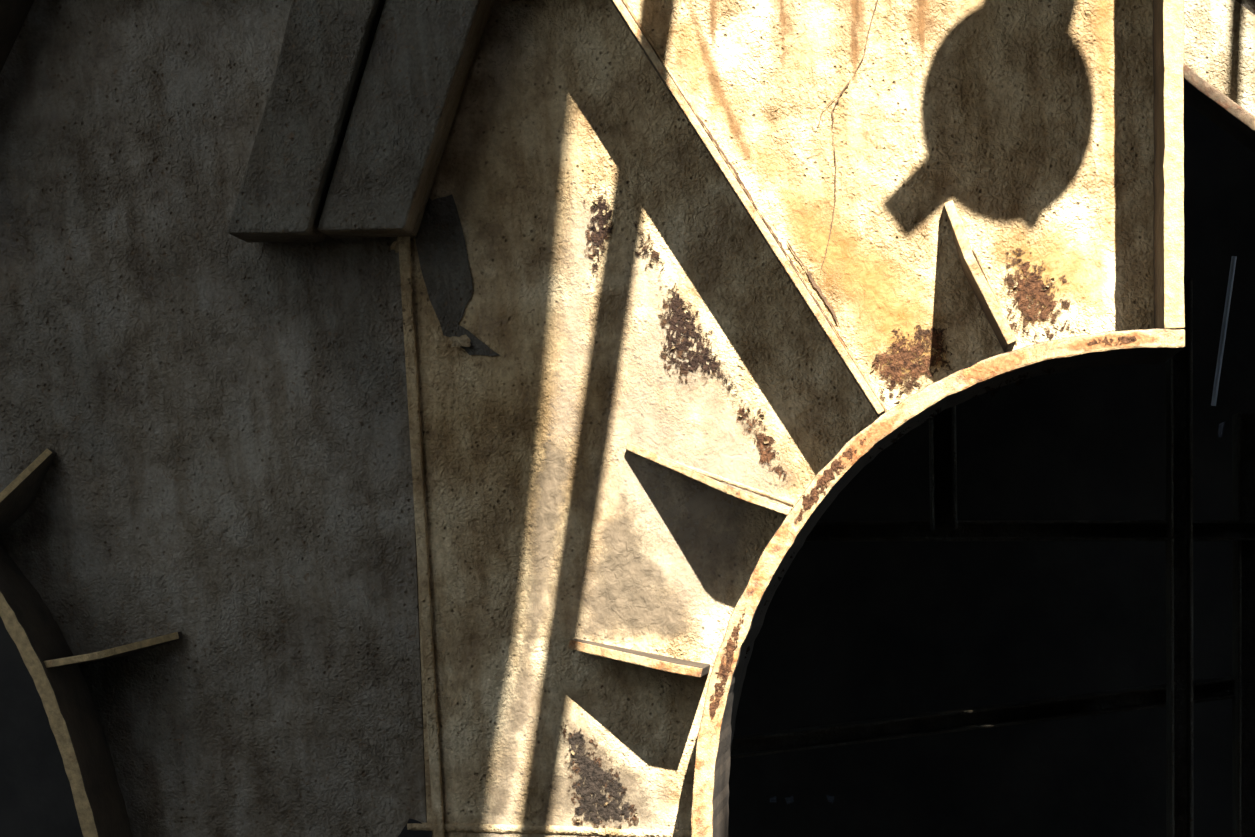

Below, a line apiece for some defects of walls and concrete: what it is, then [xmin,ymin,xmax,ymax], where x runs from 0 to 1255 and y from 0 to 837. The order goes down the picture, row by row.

corrosion [1015,235,1091,303]
peeling [561,720,639,837]